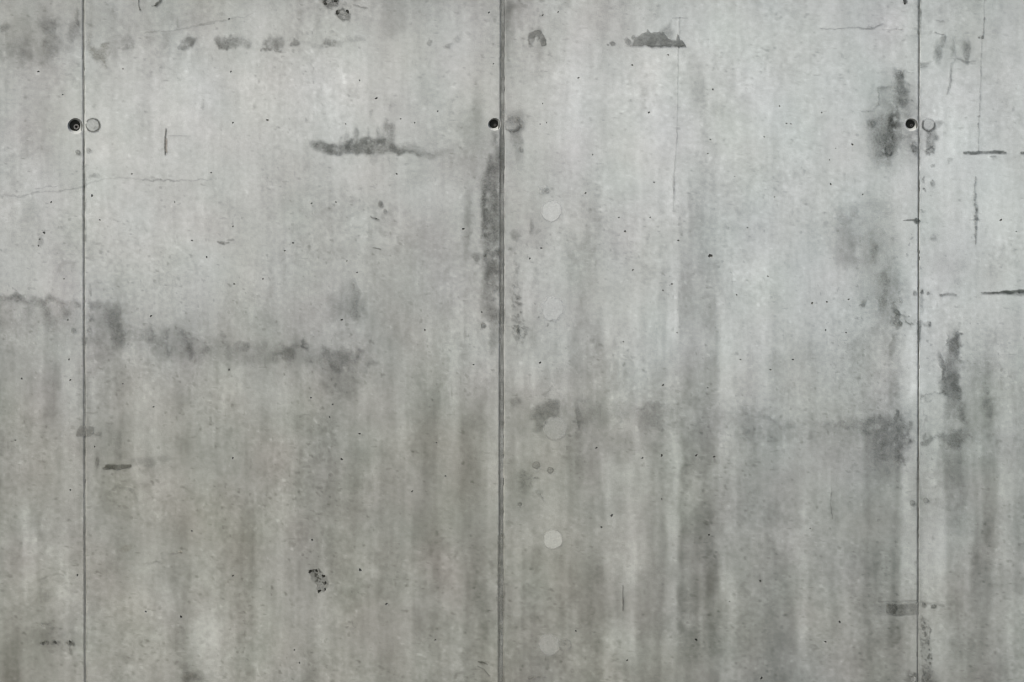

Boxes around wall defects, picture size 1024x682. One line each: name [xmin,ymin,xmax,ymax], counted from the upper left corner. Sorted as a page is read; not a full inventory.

damp [314,138,405,155]
damp [483,163,500,289]
damp [942,364,964,420]